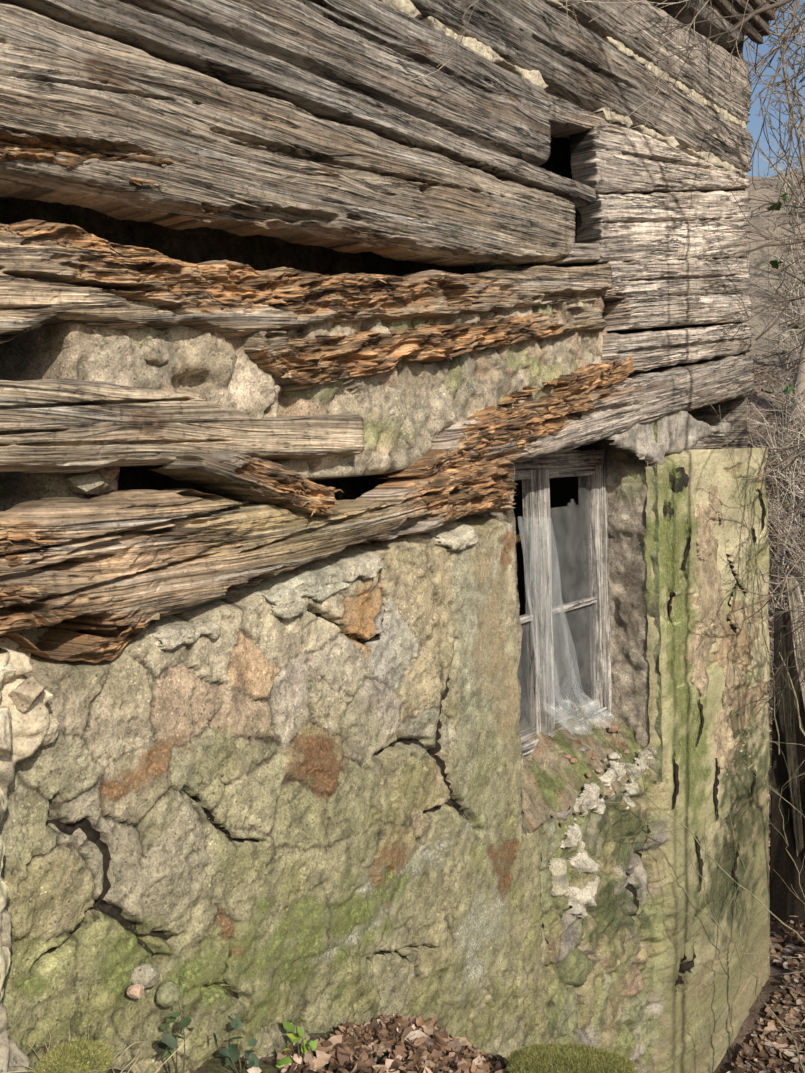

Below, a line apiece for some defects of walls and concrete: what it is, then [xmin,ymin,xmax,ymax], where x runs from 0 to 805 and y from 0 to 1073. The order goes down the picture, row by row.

water stain [644,463,680,612]
crack [668,519,691,623]
flaking render [0,661,46,756]
crack [44,811,173,956]
crack [182,790,258,842]
crack [374,674,470,824]
spalling [549,749,656,919]
crack [625,825,651,920]
crack [673,699,704,809]
crack [713,765,721,819]
crack [375,945,432,960]
crack [675,953,696,992]